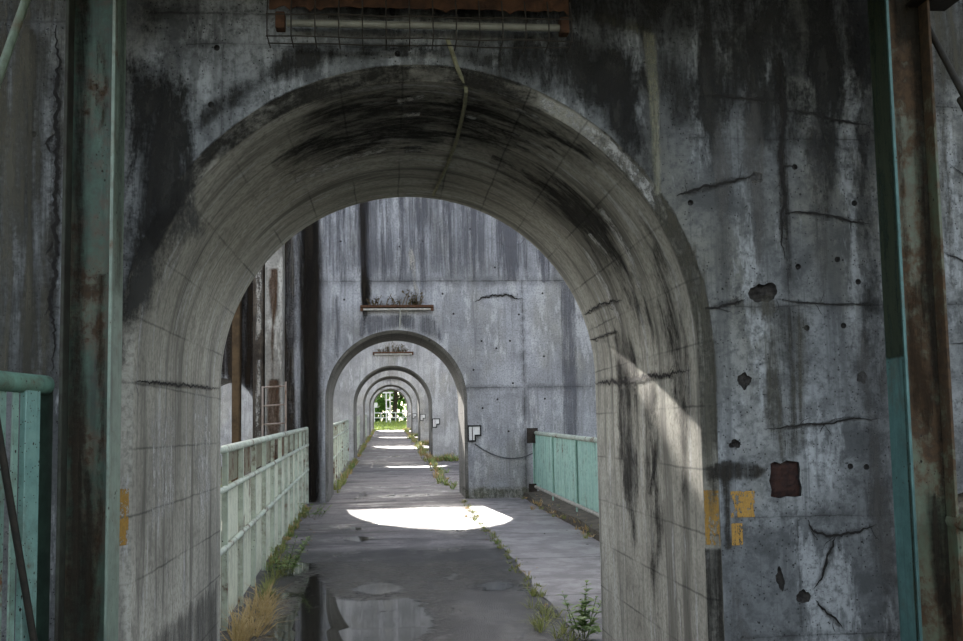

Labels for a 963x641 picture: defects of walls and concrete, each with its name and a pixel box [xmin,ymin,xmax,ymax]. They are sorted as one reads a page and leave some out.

crack [45,25,62,375]
crack [699,54,874,259]
rust [64,0,102,641]
rust [97,275,105,392]
damp [122,0,873,641]
crack [594,363,691,393]
spalling [737,372,752,390]
spalling [748,282,777,303]
rust [769,460,800,498]
crack [767,416,880,434]
rust [894,0,954,640]
crack [808,520,878,631]